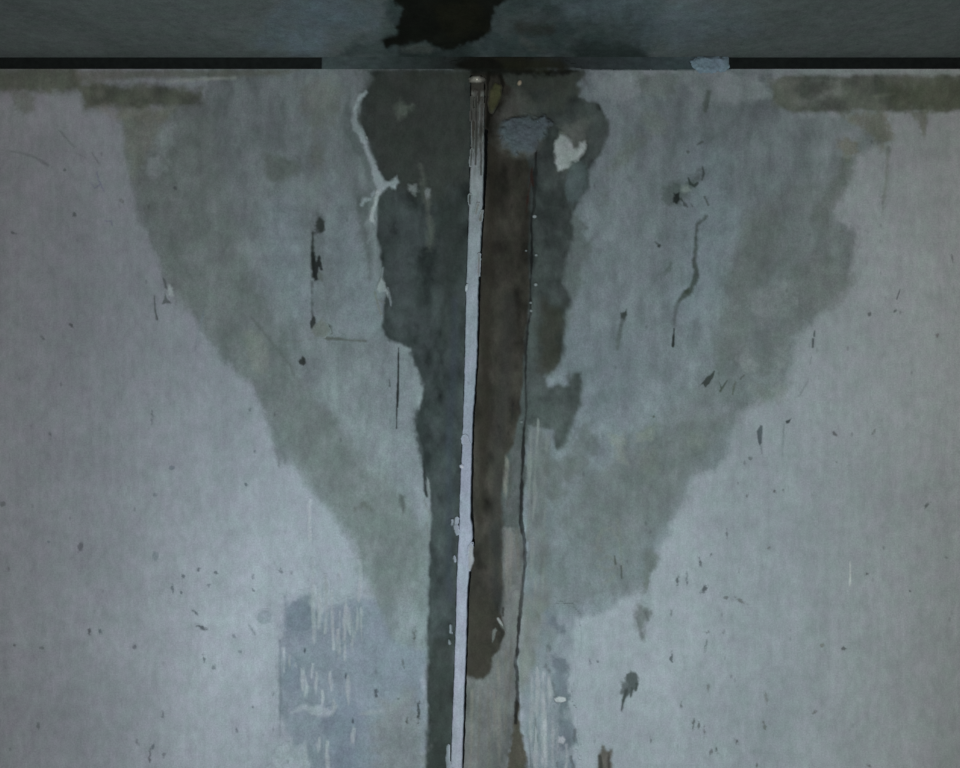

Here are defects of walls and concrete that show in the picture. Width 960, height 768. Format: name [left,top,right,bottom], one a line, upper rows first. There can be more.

water stain [0,69,428,644]
corrosion [467,75,552,684]
crack [505,149,539,726]
spalling [552,130,588,173]
water stain [245,0,960,768]